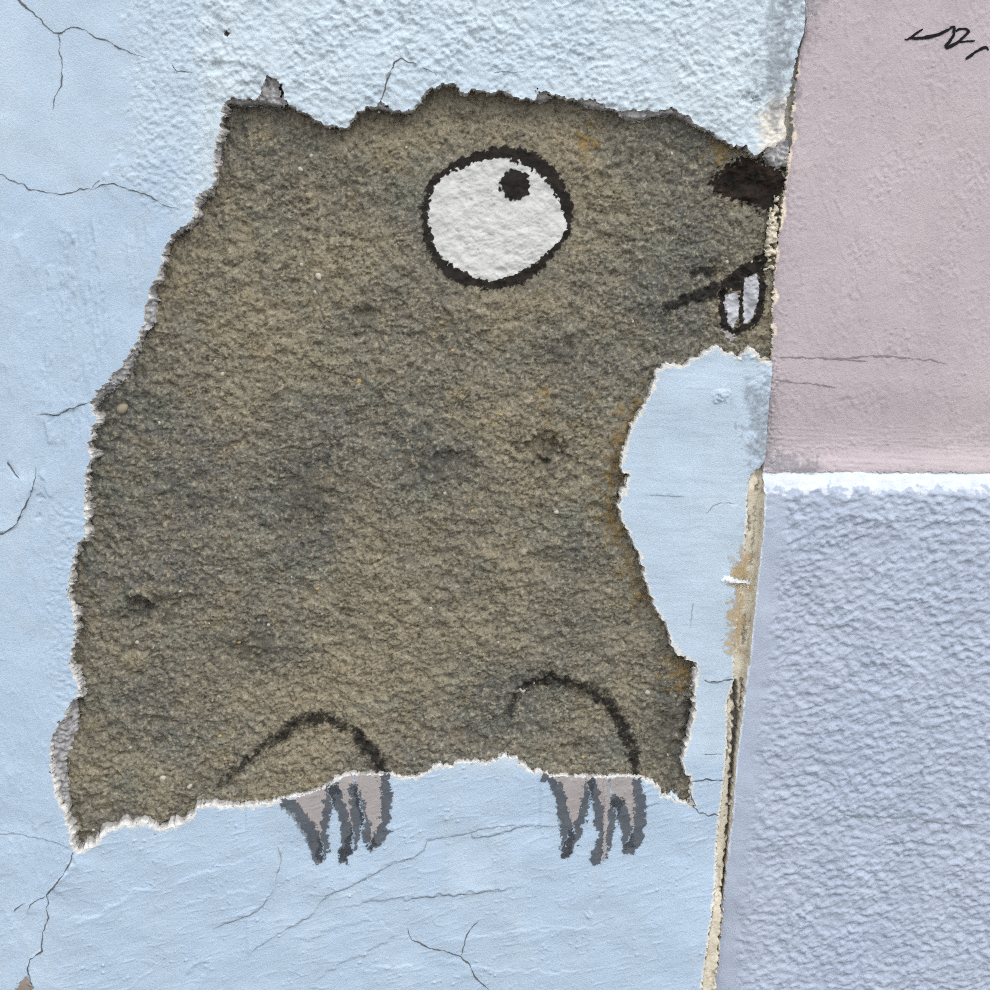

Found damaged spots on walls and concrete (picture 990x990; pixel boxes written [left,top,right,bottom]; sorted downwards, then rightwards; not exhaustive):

crack [18,0,143,110]
crack [0,462,36,535]
spalling [48,75,790,853]
crack [214,846,282,929]
crack [252,825,549,952]
crack [407,923,489,990]